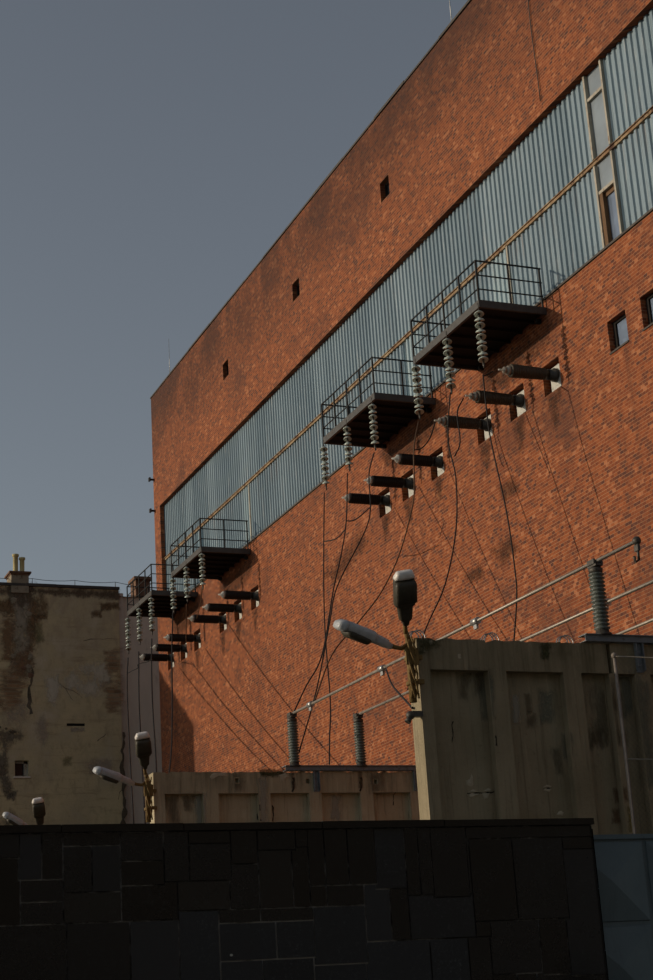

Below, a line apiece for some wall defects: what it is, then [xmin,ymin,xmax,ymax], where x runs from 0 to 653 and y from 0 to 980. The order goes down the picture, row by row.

crack [26,668,34,715]
spalling [0,726,22,801]